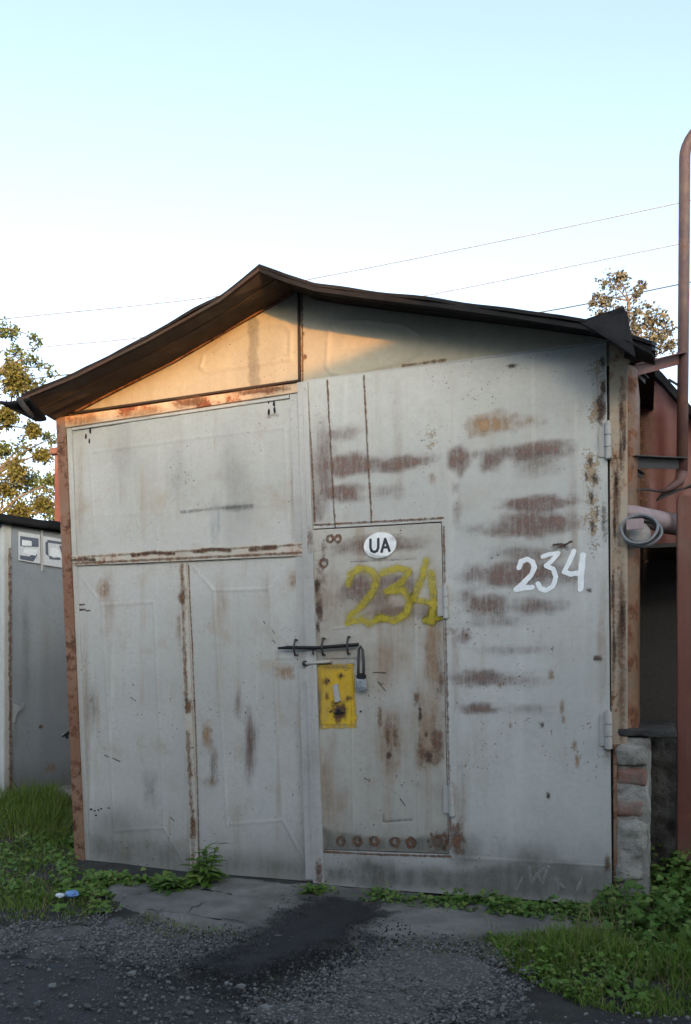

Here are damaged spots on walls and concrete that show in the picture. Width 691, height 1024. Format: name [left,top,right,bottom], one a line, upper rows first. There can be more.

corrosion [173,396,205,406]
corrosion [308,375,446,582]
corrosion [449,449,468,470]
corrosion [484,442,559,469]
corrosion [602,396,626,537]
corrosion [495,496,573,548]
corrosion [470,597,503,613]
corrosion [71,544,302,865]
corrosion [415,619,450,779]
corrosion [465,671,501,686]
corrosion [594,569,626,740]
corrosion [316,818,465,882]